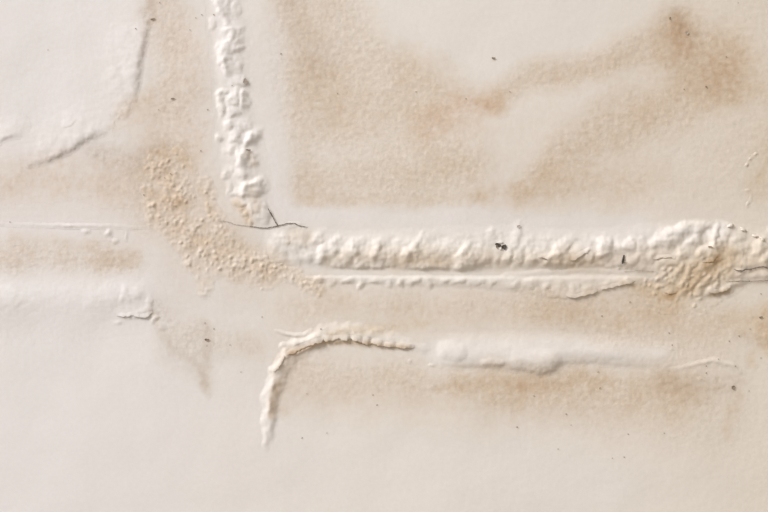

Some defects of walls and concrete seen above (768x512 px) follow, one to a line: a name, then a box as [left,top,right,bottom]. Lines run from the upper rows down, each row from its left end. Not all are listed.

damp [249,0,768,219]
crack [225,209,305,229]
damp [281,343,751,446]